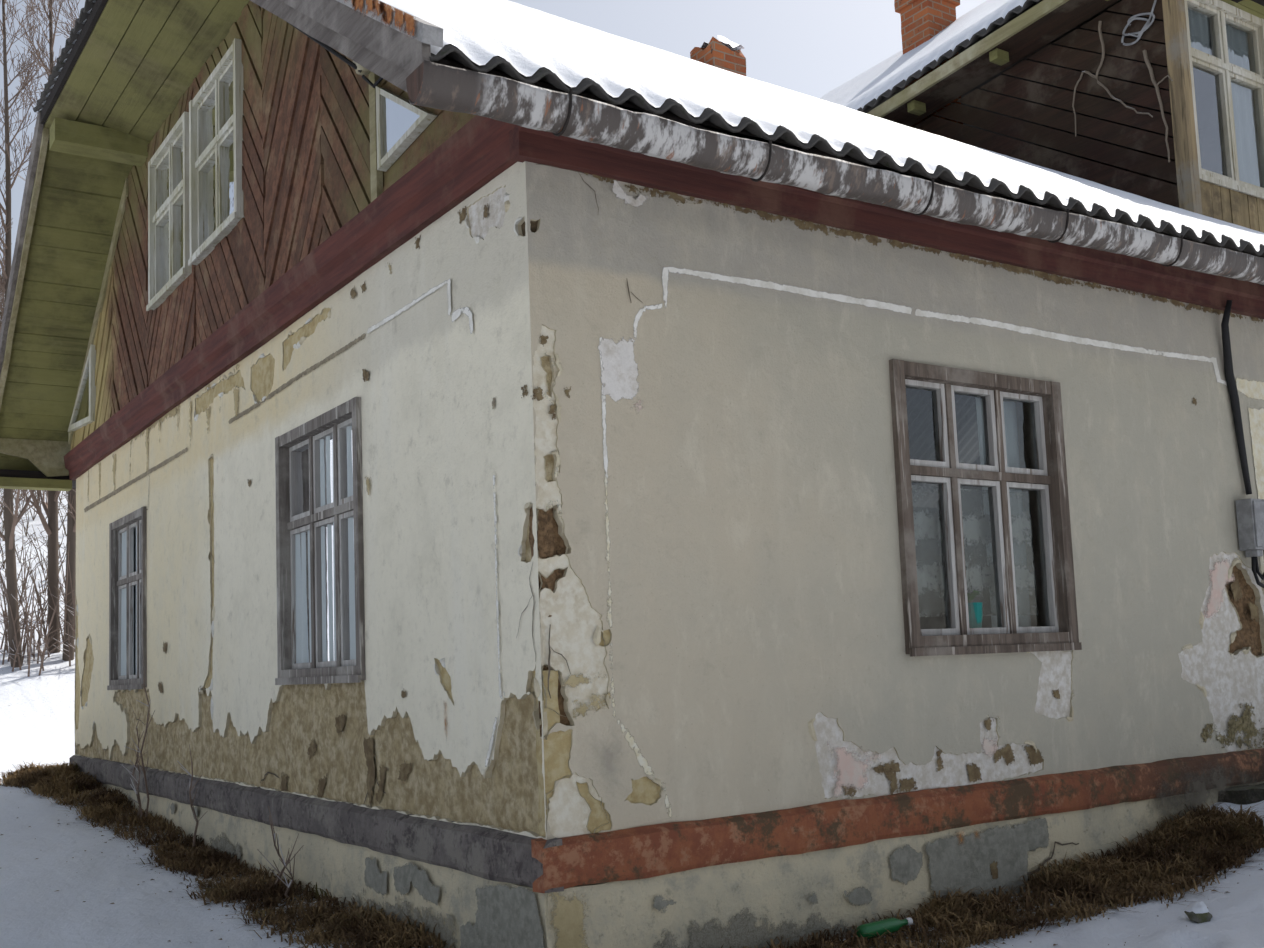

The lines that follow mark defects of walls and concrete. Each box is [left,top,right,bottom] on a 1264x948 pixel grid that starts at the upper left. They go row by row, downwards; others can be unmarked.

flaking render [457,187,538,244]
flaking render [194,308,331,421]
flaking render [75,325,611,838]
flaking render [1027,651,1074,722]
flaking render [1178,551,1264,752]
flaking render [625,777,666,805]
flaking render [808,712,1044,799]